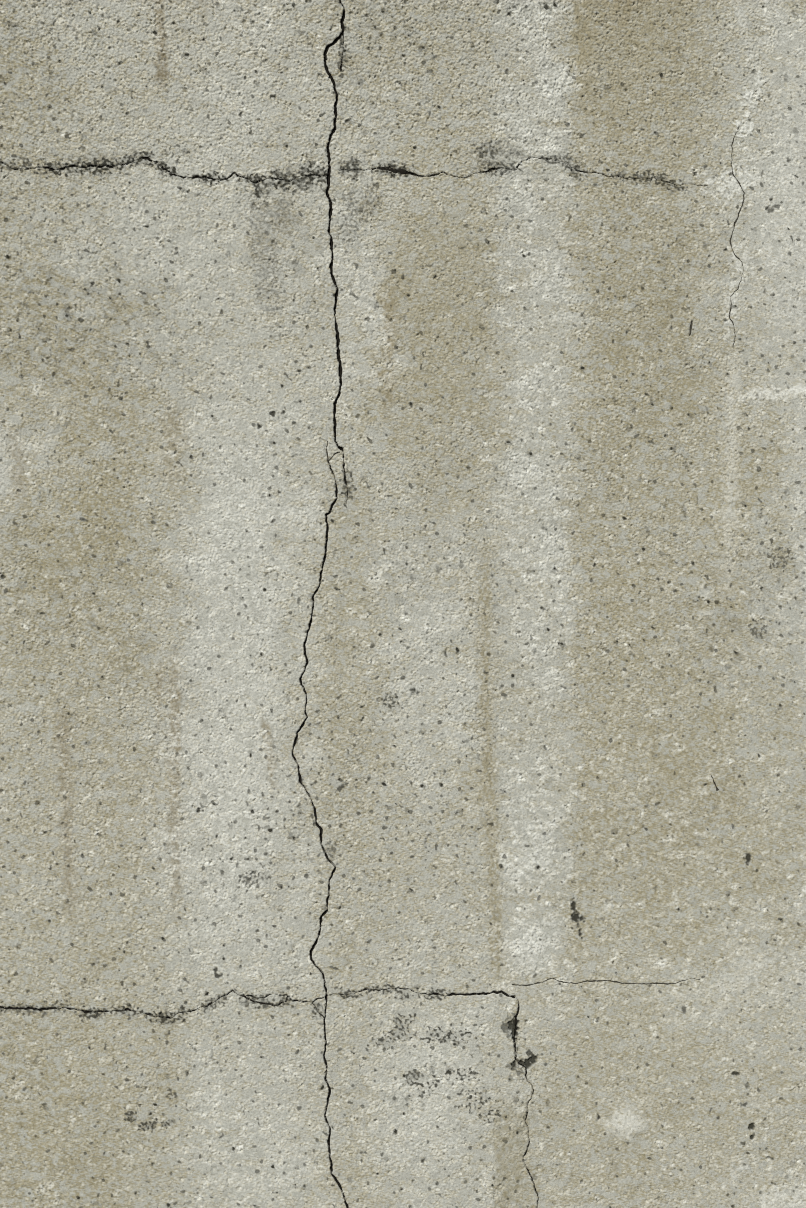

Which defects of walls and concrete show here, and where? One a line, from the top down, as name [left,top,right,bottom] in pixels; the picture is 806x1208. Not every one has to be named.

crack [0,0,692,797]
crack [0,802,535,1208]
crack [523,1099,539,1206]
crack [512,978,700,986]